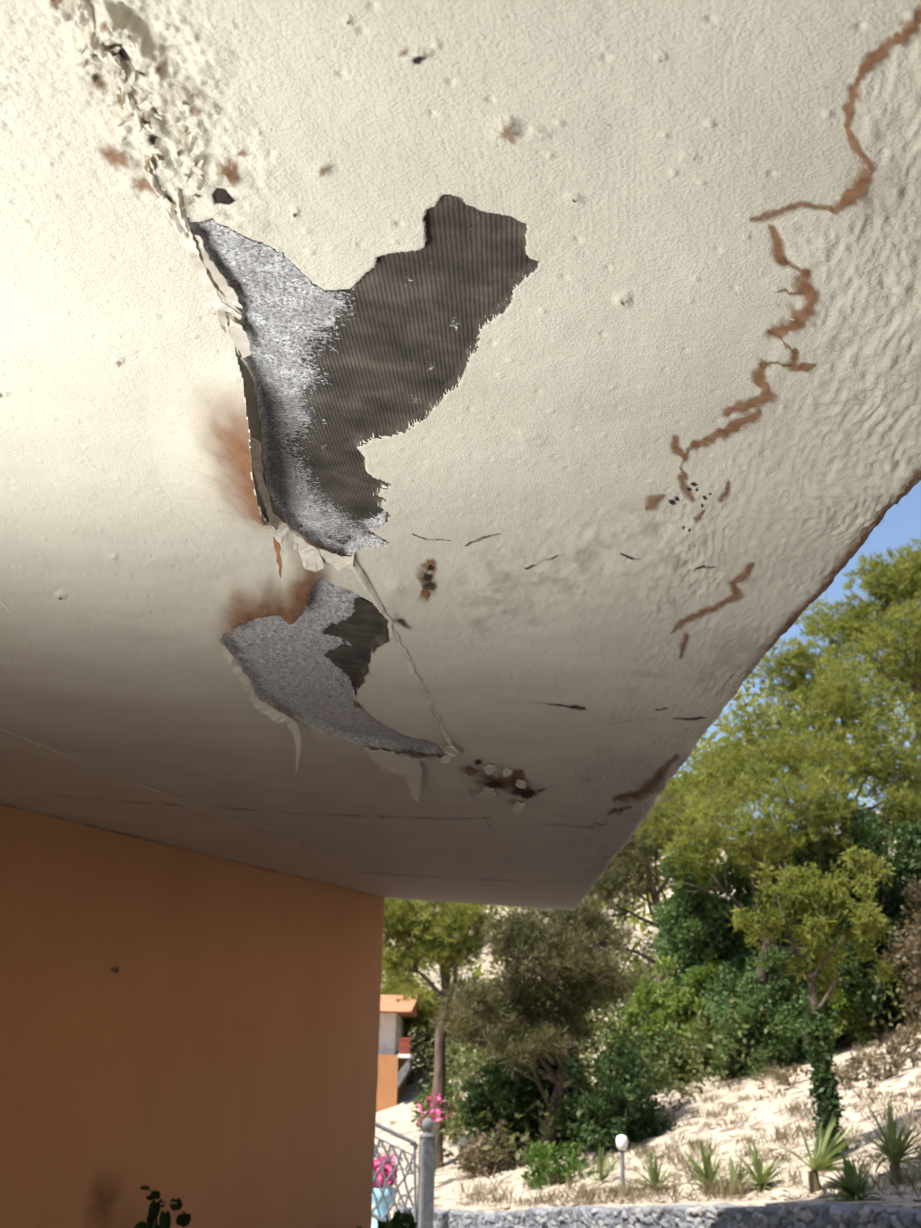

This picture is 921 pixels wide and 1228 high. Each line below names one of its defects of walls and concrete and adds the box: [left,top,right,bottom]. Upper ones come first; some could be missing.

spalling [81,20,163,176]
crack [671,9,921,479]
peeling [154,122,538,802]
crack [412,534,501,546]
crack [671,564,754,658]